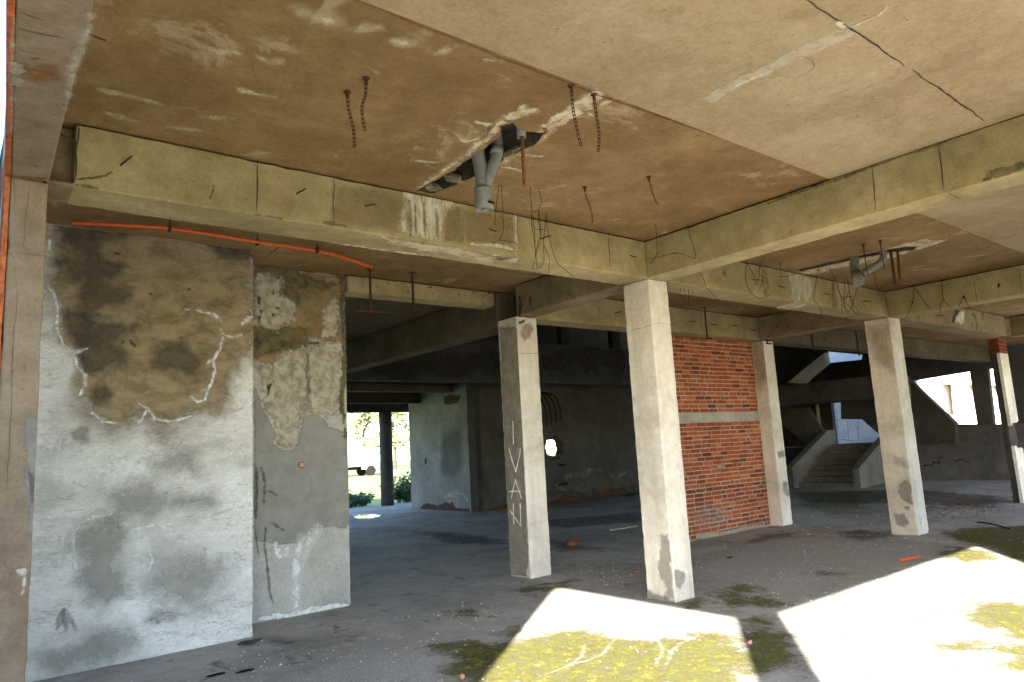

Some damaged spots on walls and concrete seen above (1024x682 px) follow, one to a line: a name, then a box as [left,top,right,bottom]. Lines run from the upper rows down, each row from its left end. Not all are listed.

damp [337,105,537,251]
damp [539,91,611,141]
damp [46,224,345,433]
peeling [253,272,348,448]